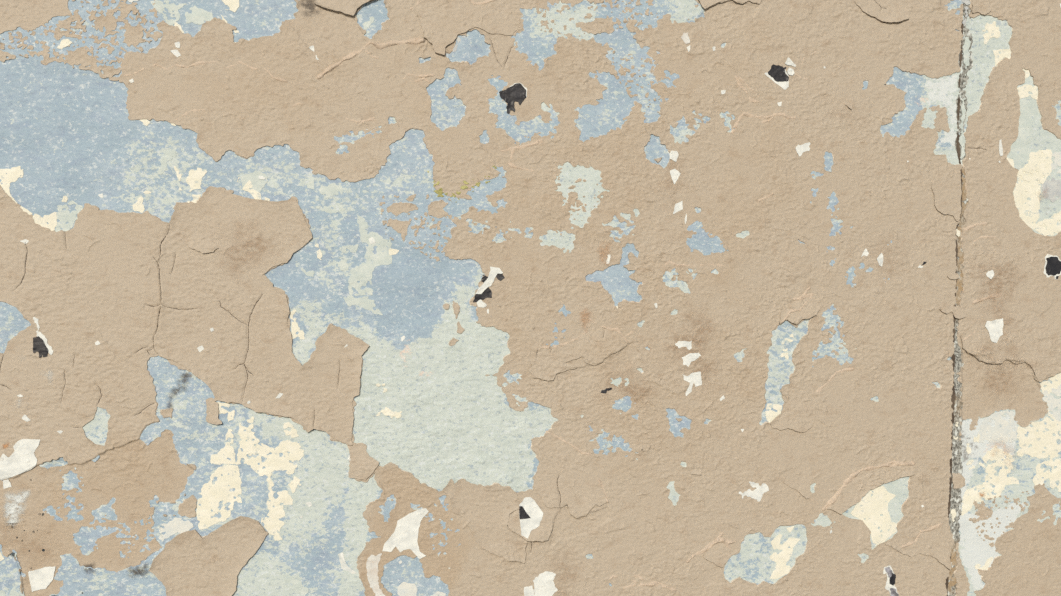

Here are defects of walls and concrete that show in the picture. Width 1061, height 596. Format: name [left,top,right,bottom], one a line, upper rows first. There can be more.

peeling [880,0,1012,221]
peeling [1006,68,1061,236]
peeling [0,0,735,596]
peeling [759,296,856,425]
crack [945,0,986,596]
peeling [724,476,910,585]
peeling [952,372,1061,596]